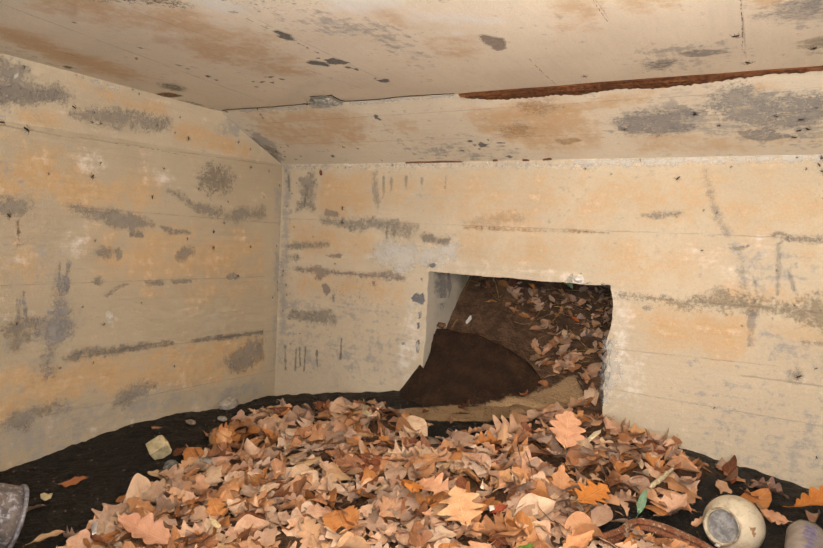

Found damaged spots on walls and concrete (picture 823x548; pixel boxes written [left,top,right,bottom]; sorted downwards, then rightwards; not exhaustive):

damp [0,58,68,106]
damp [617,108,693,137]
damp [712,84,823,141]
damp [1,262,72,351]